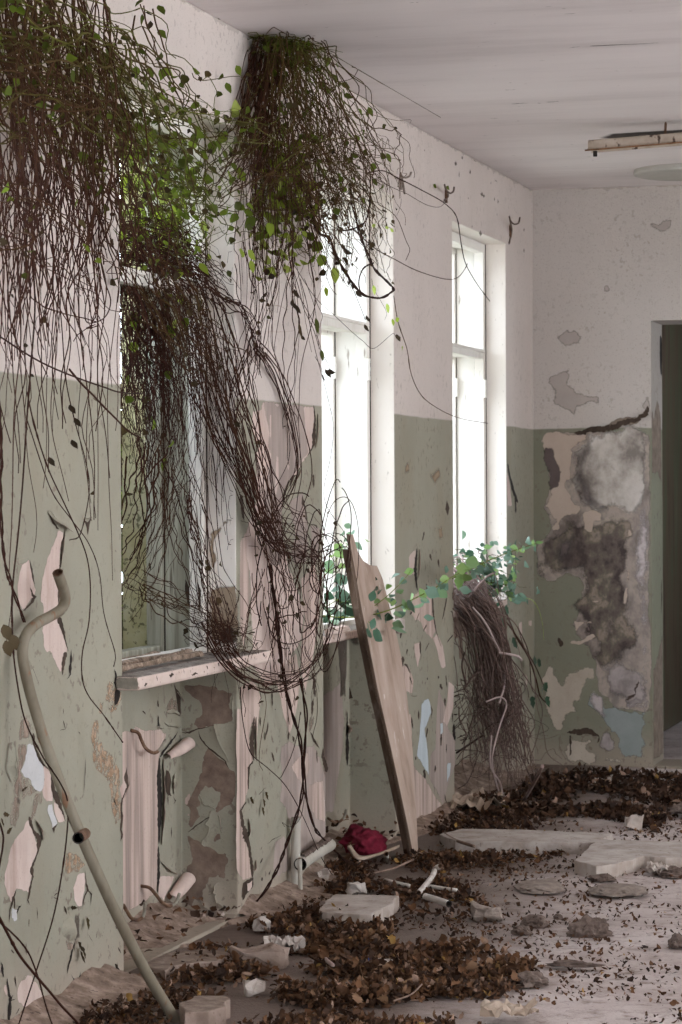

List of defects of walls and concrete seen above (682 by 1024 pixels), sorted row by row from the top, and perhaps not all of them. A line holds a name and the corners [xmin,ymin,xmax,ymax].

peeling [13,510,73,679]
peeling [116,401,358,911]
peeling [401,532,467,818]
water stain [536,431,652,712]
flaking render [541,402,662,622]
peeling [541,640,663,765]
crack [575,406,649,435]
peeling [4,718,65,921]